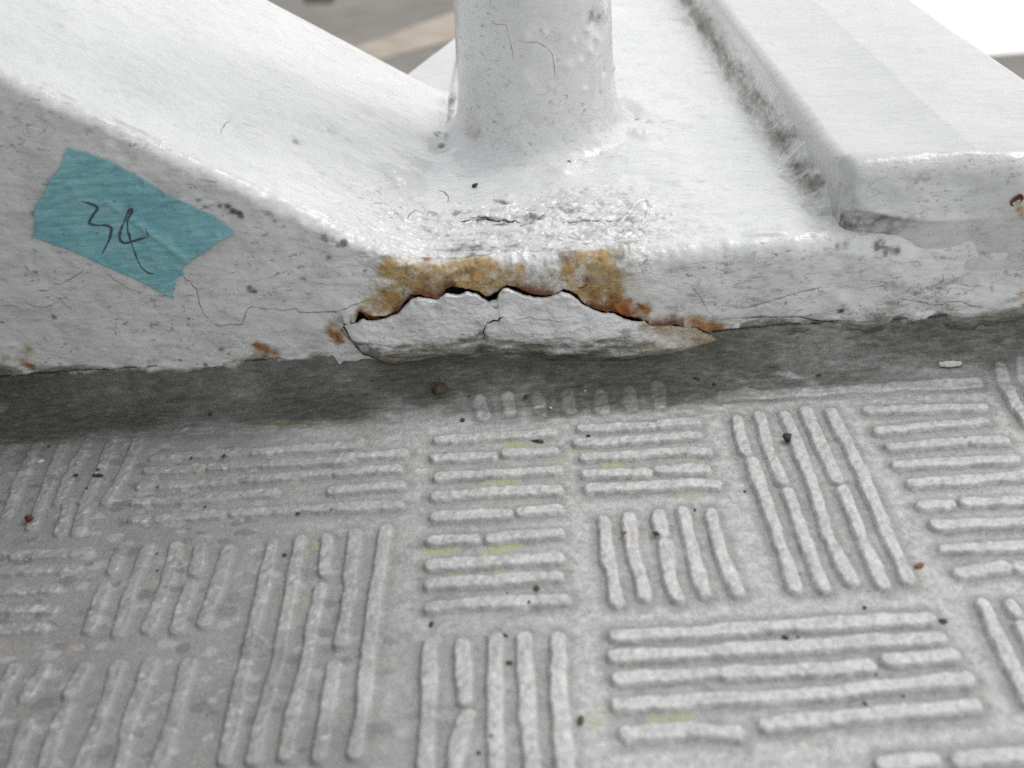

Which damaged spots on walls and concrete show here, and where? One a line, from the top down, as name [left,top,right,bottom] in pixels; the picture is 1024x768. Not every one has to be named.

rust [1010,194,1024,217]
rust [253,342,278,358]
rust [327,256,556,345]
crack [183,276,830,360]
rust [561,249,724,350]